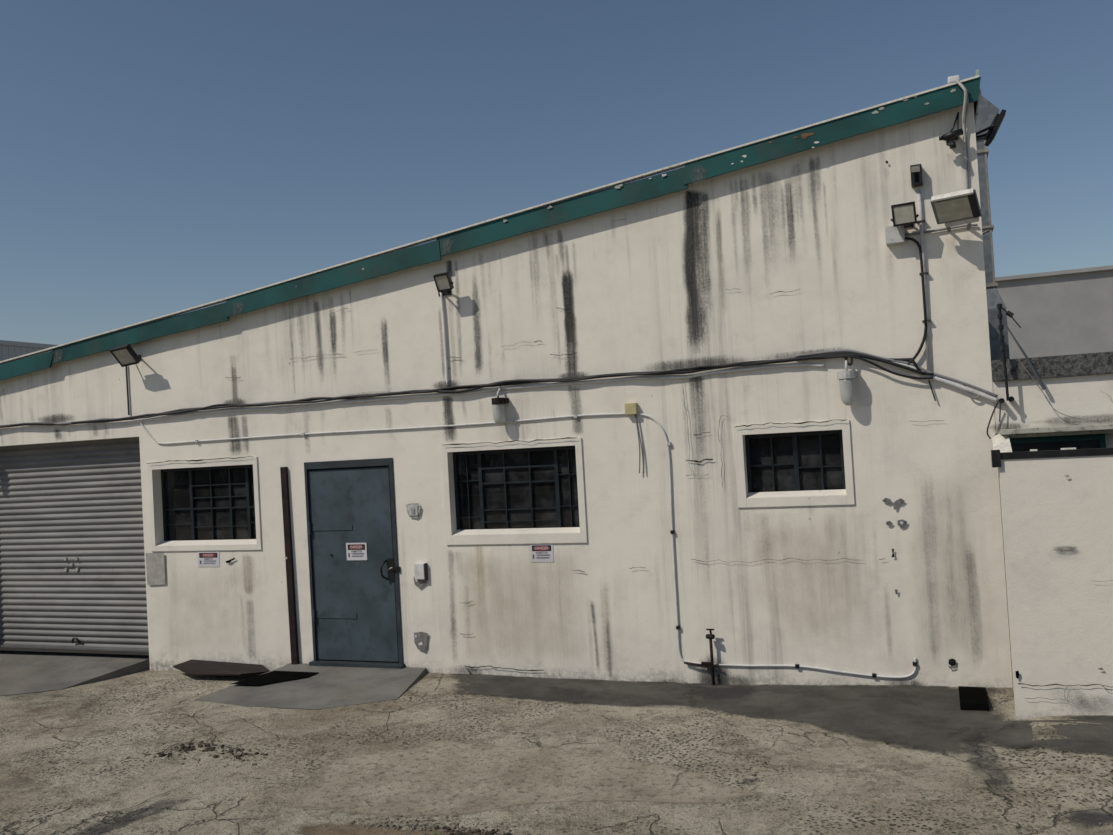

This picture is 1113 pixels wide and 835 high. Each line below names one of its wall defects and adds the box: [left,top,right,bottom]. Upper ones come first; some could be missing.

damp [768,188,794,244]
damp [684,192,721,344]
damp [315,303,335,365]
damp [561,267,584,431]
damp [655,358,733,434]